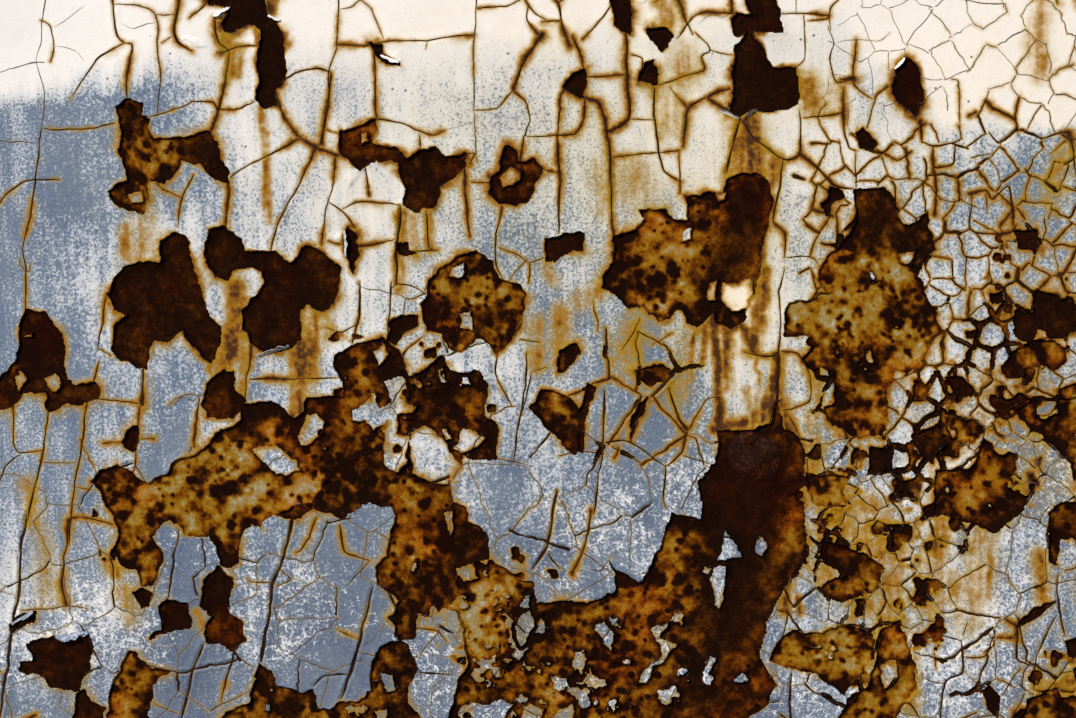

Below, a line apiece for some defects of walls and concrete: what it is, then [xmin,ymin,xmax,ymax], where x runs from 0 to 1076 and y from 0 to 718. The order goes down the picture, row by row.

peeling [720,0,801,120]
peeling [335,116,473,213]
crack [0,0,987,465]
crack [0,296,204,718]
corrosion [206,278,248,395]
corrosion [288,311,364,418]
peeling [87,168,1076,718]
crack [532,386,721,579]
corrosion [667,234,1052,712]
peeling [18,631,171,718]
crack [219,515,374,703]
corrosion [1026,650,1076,697]